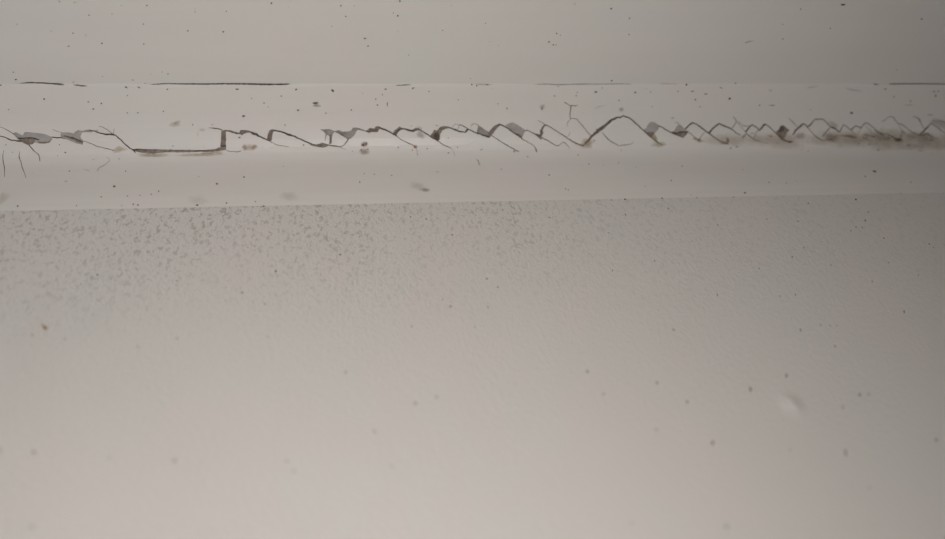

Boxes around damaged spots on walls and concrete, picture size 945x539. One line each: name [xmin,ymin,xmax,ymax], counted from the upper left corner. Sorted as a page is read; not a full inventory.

crack [0,127,40,177]
crack [81,102,945,156]